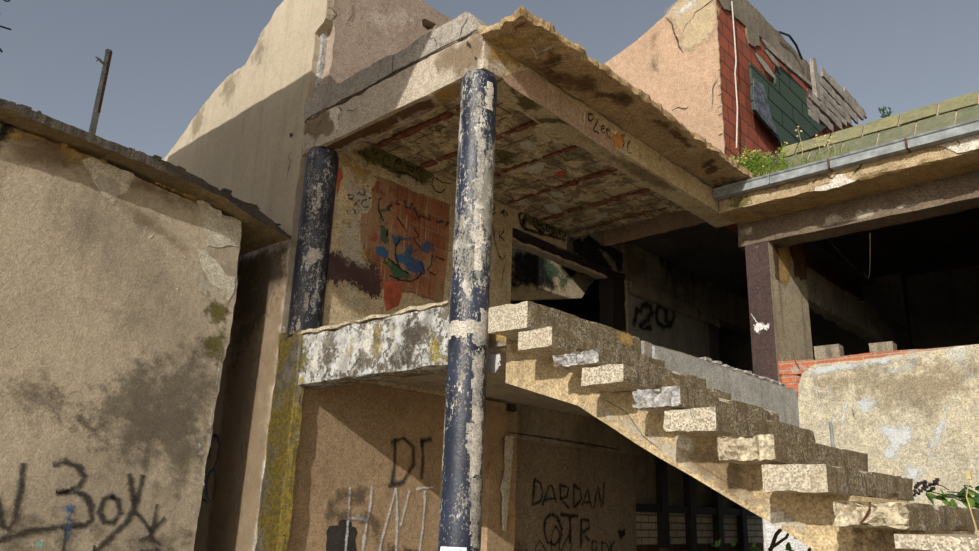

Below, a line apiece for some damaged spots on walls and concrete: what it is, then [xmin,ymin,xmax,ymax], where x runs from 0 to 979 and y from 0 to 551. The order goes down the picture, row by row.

damp [510,89,585,126]
damp [488,22,633,107]
peeling [82,157,135,204]
damp [614,158,671,189]
peeling [193,200,242,305]
spalling [307,175,450,311]
damp [203,246,288,551]
peeling [448,308,501,550]